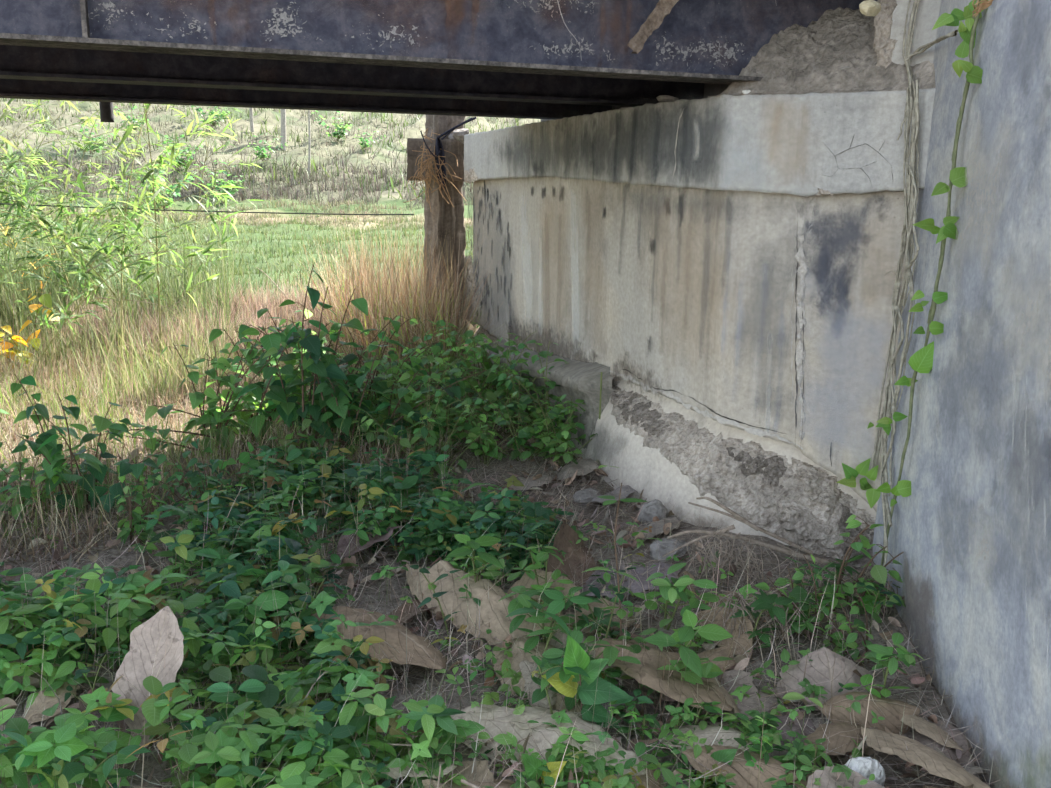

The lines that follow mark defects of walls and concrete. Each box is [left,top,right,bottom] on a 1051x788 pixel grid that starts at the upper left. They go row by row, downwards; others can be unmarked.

spalling [873,0,898,68]
water stain [501,107,717,179]
crack [790,211,809,448]
water stain [805,209,867,332]
spalling [609,369,875,570]